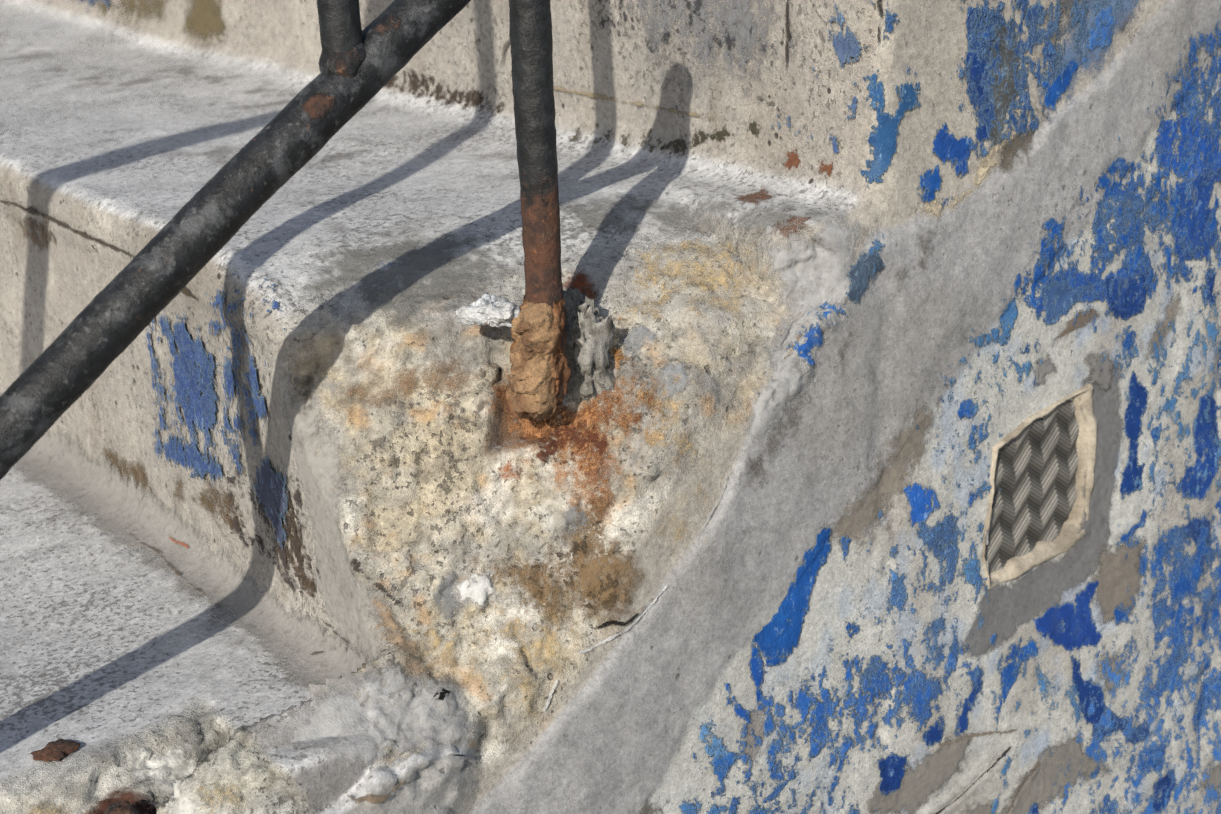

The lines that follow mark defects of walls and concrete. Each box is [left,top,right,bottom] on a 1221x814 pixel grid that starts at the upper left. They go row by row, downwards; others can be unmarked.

rust [493,271,659,521]
peeling [678,0,1221,814]
spalling [142,223,885,774]
rust [87,790,157,814]
spalling [0,699,320,814]
crack [935,729,1017,814]
crack [1007,763,1040,814]